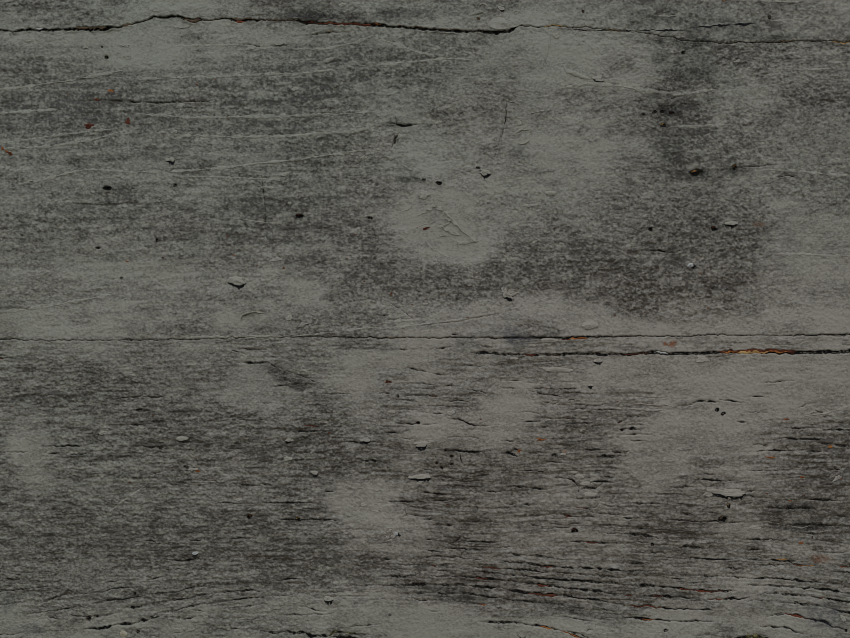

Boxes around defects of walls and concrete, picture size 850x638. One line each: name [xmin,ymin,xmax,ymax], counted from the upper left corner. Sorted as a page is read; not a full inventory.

crack [0,15,850,44]
crack [0,300,850,638]